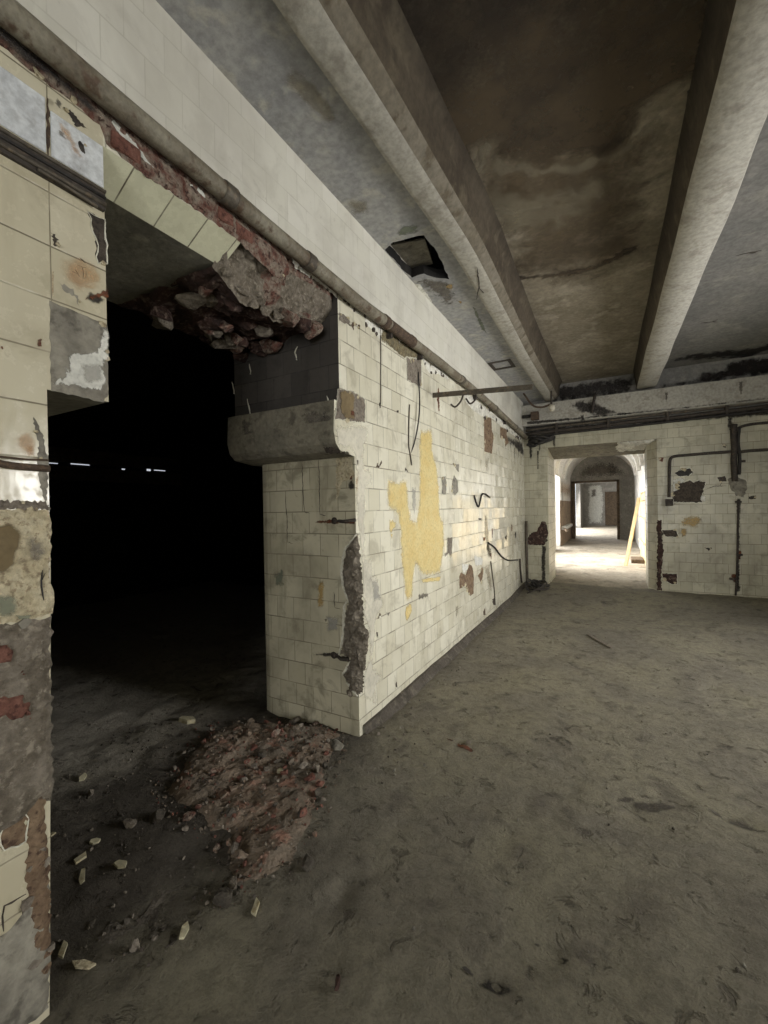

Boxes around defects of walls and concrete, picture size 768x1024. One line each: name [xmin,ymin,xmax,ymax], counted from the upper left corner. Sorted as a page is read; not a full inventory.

spalling [0,30,448,402]
water stain [397,0,708,280]
spalling [338,533,379,697]
peeling [459,555,484,596]
peeling [464,395,522,454]
spalling [528,521,548,546]
peeling [671,468,726,503]
spalling [0,417,55,1024]